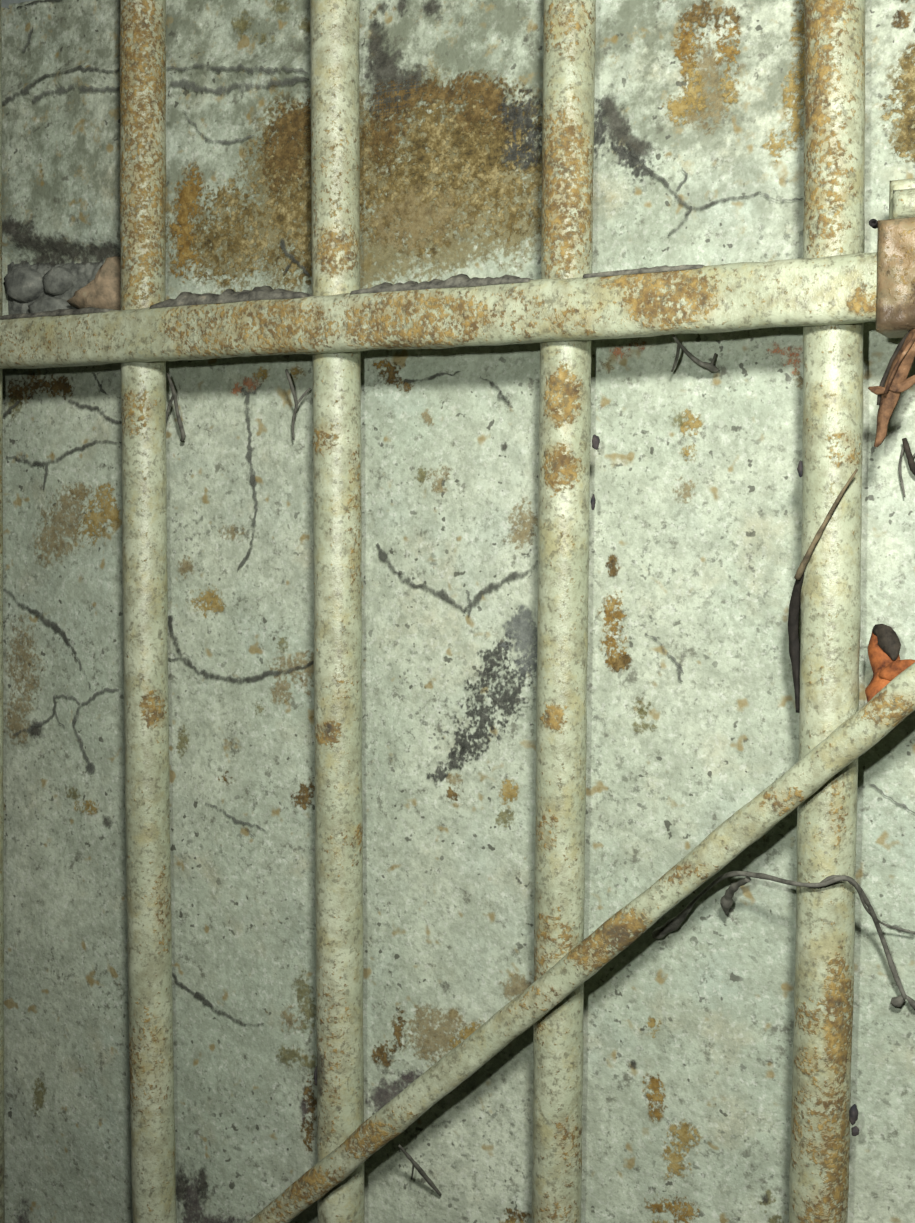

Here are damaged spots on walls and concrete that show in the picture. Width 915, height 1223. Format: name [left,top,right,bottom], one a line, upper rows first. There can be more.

rust [662,0,741,133]
rust [882,44,915,162]
rust [892,0,911,28]
rust [165,91,312,292]
rust [359,70,543,289]
crack [626,141,803,236]
crack [237,383,262,571]
crack [376,543,538,616]
crack [3,589,119,774]
crack [168,615,314,683]
mould [427,605,537,785]
rust [630,1060,701,1177]